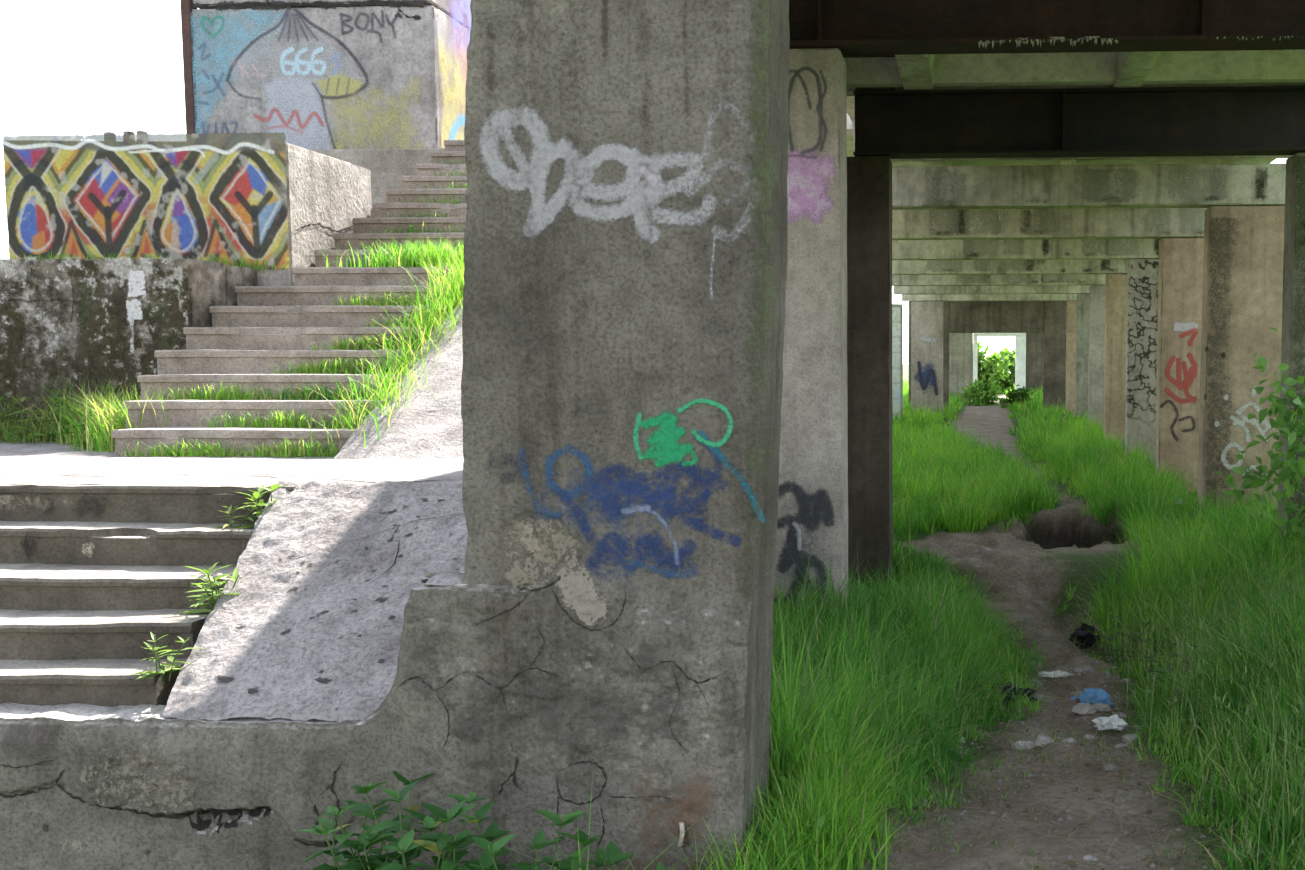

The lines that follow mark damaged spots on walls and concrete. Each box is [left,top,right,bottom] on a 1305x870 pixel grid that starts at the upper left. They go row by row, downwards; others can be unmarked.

leakage [747,0,774,402]
leakage [0,257,188,399]
leakage [1292,155,1305,423]
peeling [500,517,609,628]
crack [395,567,726,751]
crack [0,759,269,831]
crack [293,761,342,847]
crack [499,743,521,794]
crack [556,761,670,847]